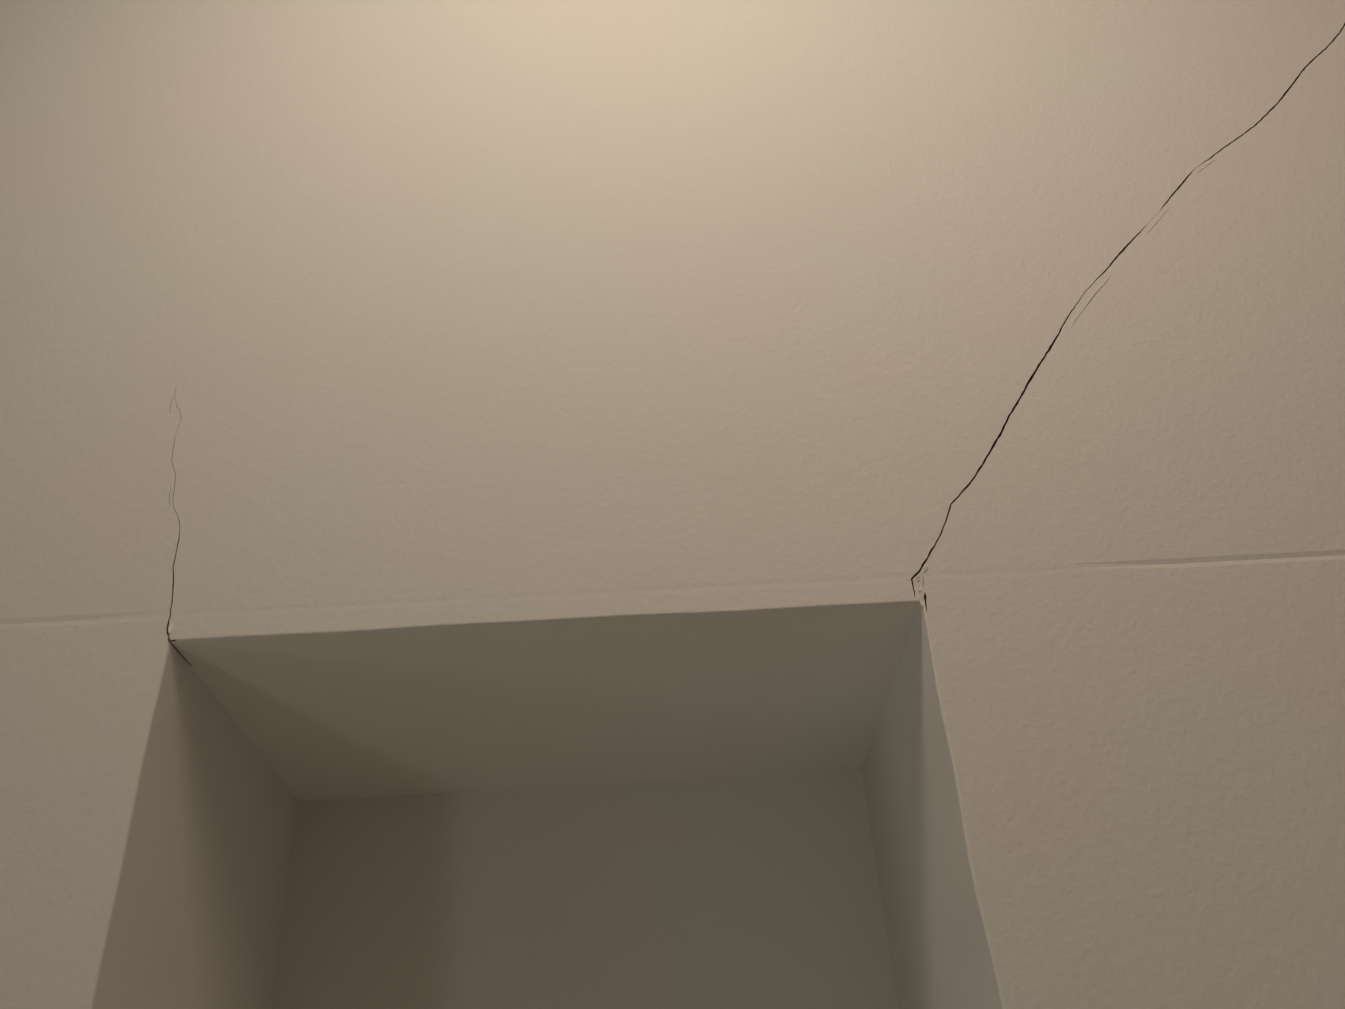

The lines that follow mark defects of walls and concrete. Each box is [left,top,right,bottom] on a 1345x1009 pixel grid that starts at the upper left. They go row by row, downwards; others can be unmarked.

crack [166,389,191,665]
crack [907,23,1345,611]